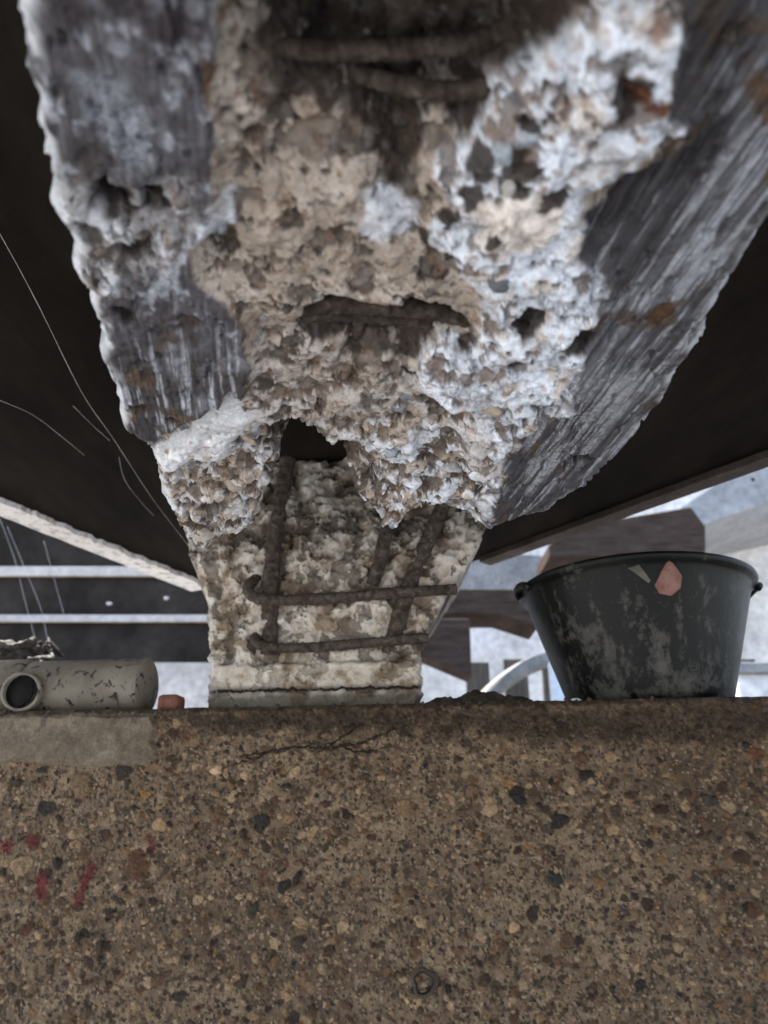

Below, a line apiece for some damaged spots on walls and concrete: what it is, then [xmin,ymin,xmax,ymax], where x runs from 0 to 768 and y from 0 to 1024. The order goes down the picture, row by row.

spalling [19,0,68,206]
spalling [100,0,601,666]
damp [418,0,749,524]
spalling [580,136,685,212]
corrosion [623,77,672,119]
corrosion [650,20,664,42]
spalling [608,204,768,461]
crack [223,724,392,769]